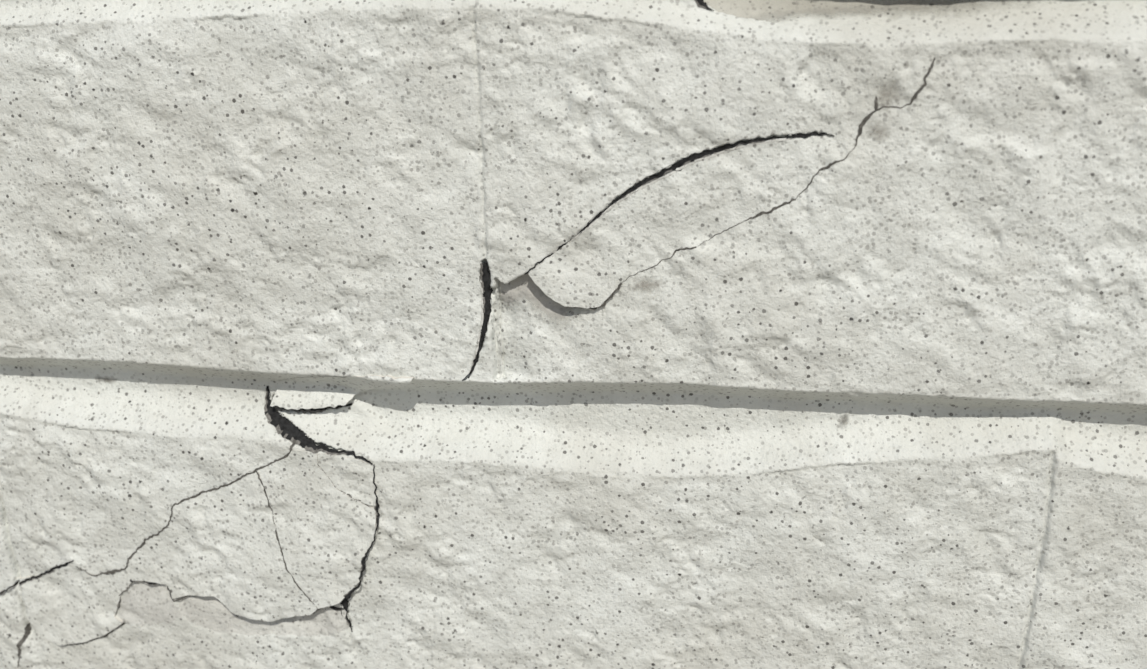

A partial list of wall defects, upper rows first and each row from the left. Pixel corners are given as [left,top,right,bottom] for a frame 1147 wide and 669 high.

crack [525,58,936,310]
crack [462,263,493,381]
crack [0,386,380,646]
crack [16,623,32,667]